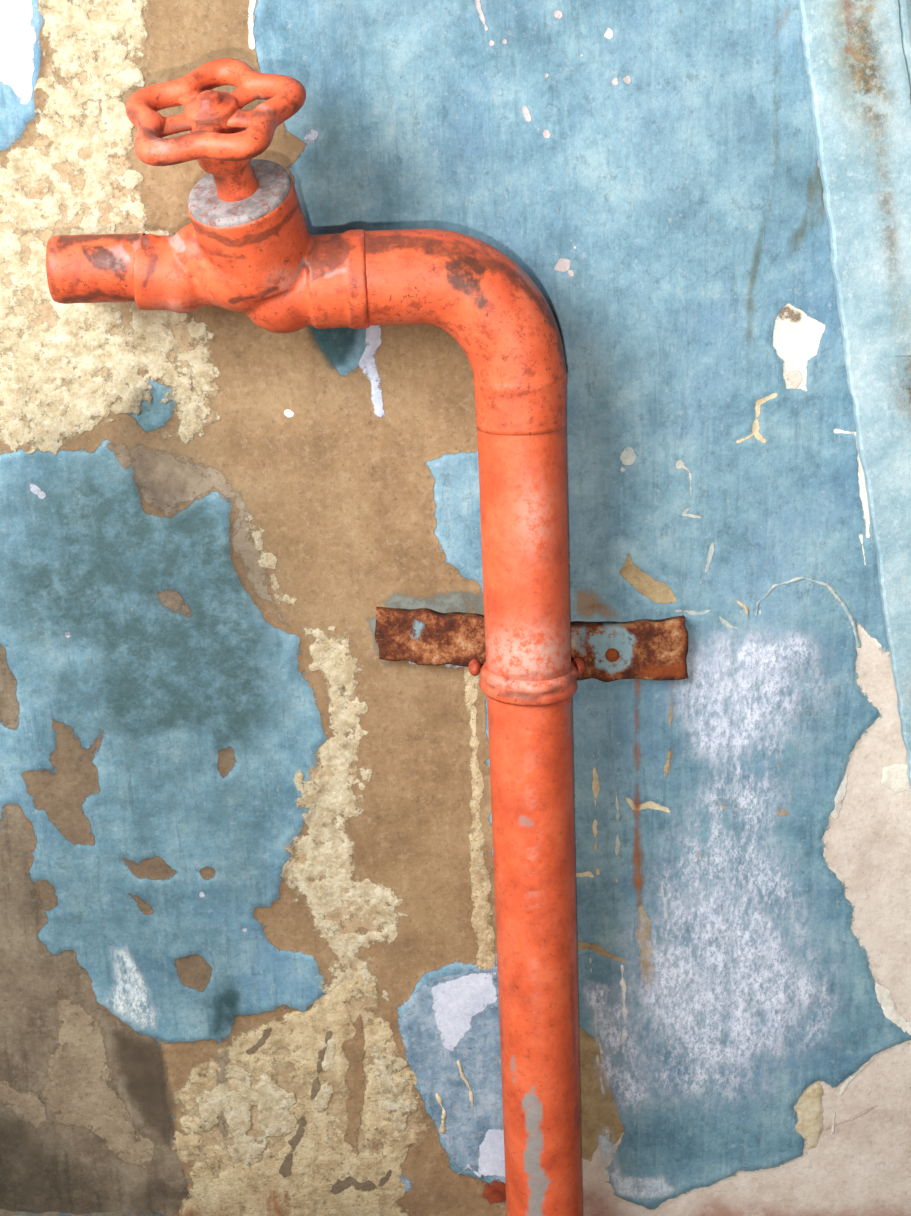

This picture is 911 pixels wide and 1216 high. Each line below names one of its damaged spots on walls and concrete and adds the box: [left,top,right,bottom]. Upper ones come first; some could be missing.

peeling [0,0,507,1216]
water stain [598,1127,674,1199]
water stain [586,635,831,1110]
peeling [579,623,911,1216]